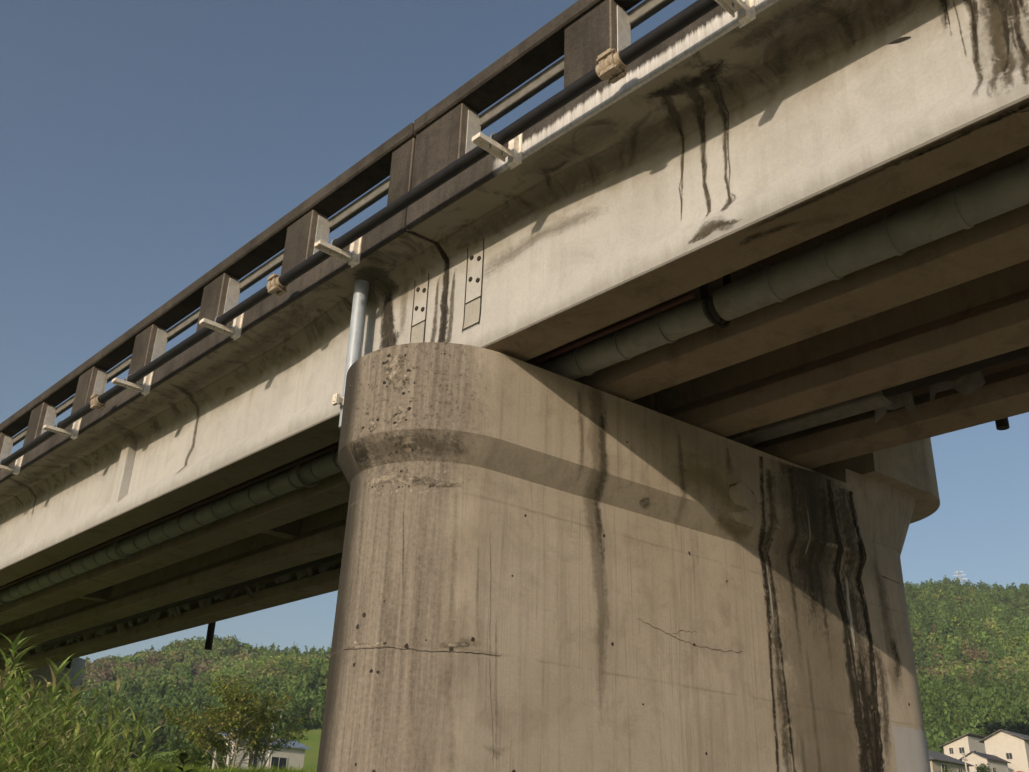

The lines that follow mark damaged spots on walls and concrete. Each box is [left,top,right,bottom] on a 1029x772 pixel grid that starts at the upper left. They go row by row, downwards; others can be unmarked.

leakage [940,0,1029,90]
leakage [647,59,737,242]
leakage [746,101,1029,243]
leakage [595,417,606,548]
crack [344,647,502,761]
crack [641,620,743,653]
leakage [758,456,796,772]
leakage [787,467,900,772]